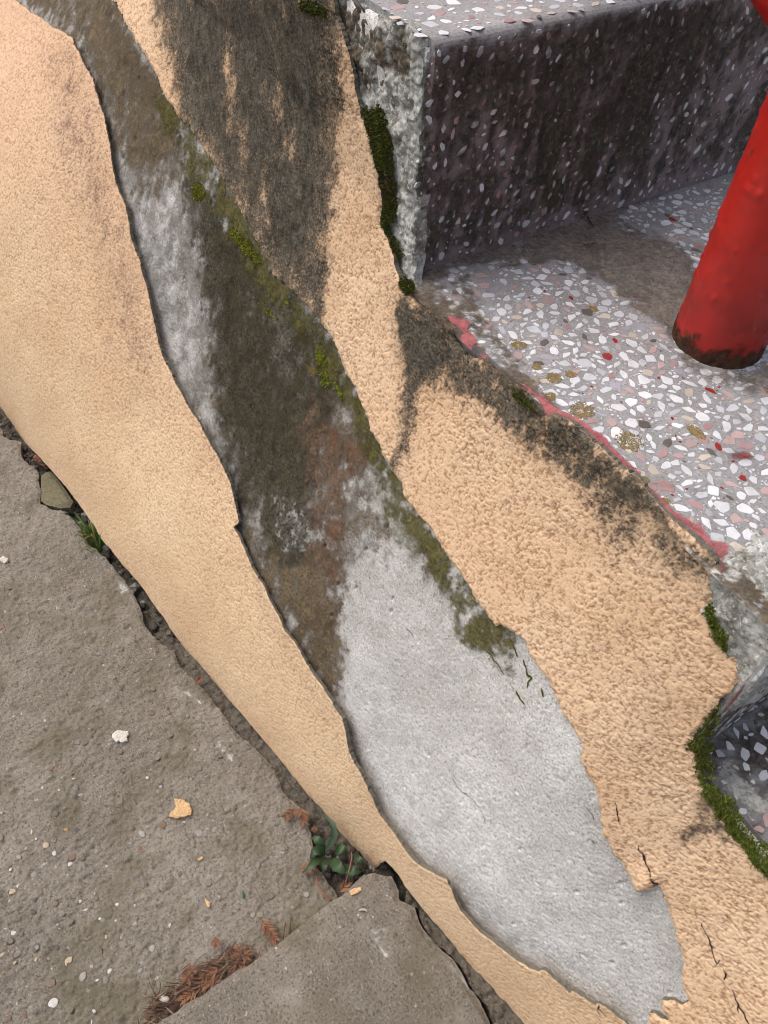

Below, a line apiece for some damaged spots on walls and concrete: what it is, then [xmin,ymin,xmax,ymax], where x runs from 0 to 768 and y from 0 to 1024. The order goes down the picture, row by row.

peeling [16,0,309,637]
water stain [27,0,398,696]
peeling [278,284,688,1024]
water stain [390,297,664,543]
peeling [377,0,768,555]
crack [701,924,749,1024]